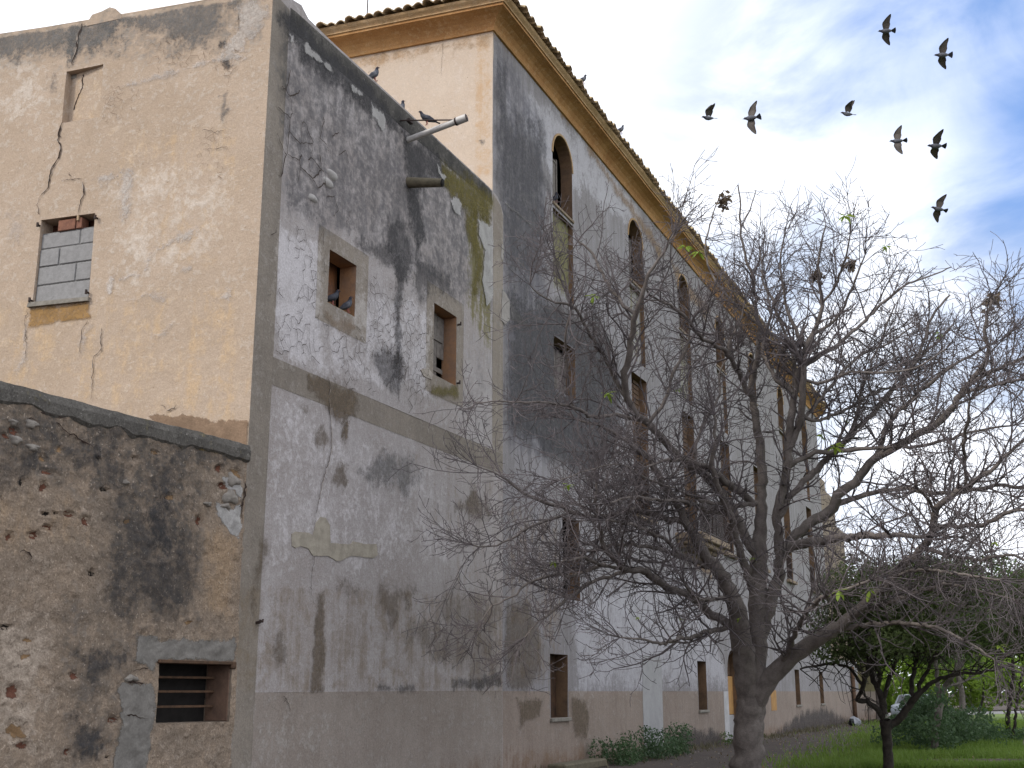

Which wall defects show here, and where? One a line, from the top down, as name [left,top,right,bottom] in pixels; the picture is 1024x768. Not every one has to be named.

crack [37,23,85,214]
damp [278,14,450,392]
crack [271,70,433,526]
damp [465,212,490,295]
crack [78,321,103,397]
spalling [149,414,248,445]
spalling [215,465,243,538]
damp [311,594,325,692]